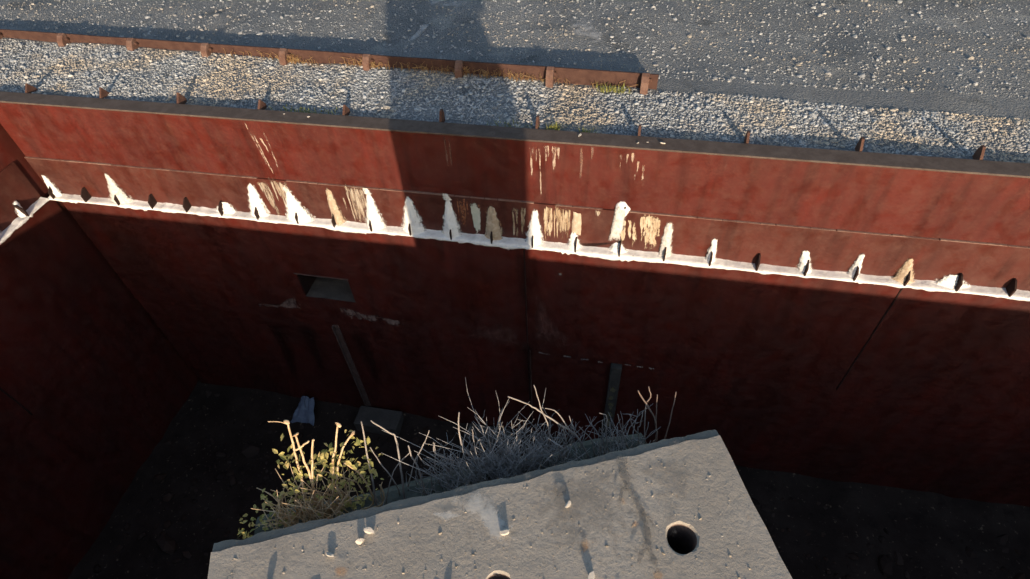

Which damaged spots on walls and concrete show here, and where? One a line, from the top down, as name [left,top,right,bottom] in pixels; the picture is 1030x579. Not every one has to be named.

water stain [245,124,288,214]
water stain [530,146,560,193]
water stain [343,186,367,221]
peeling [470,204,481,233]
water stain [512,208,526,236]
water stain [544,206,570,239]
peeling [620,215,660,248]
crack [616,456,657,564]